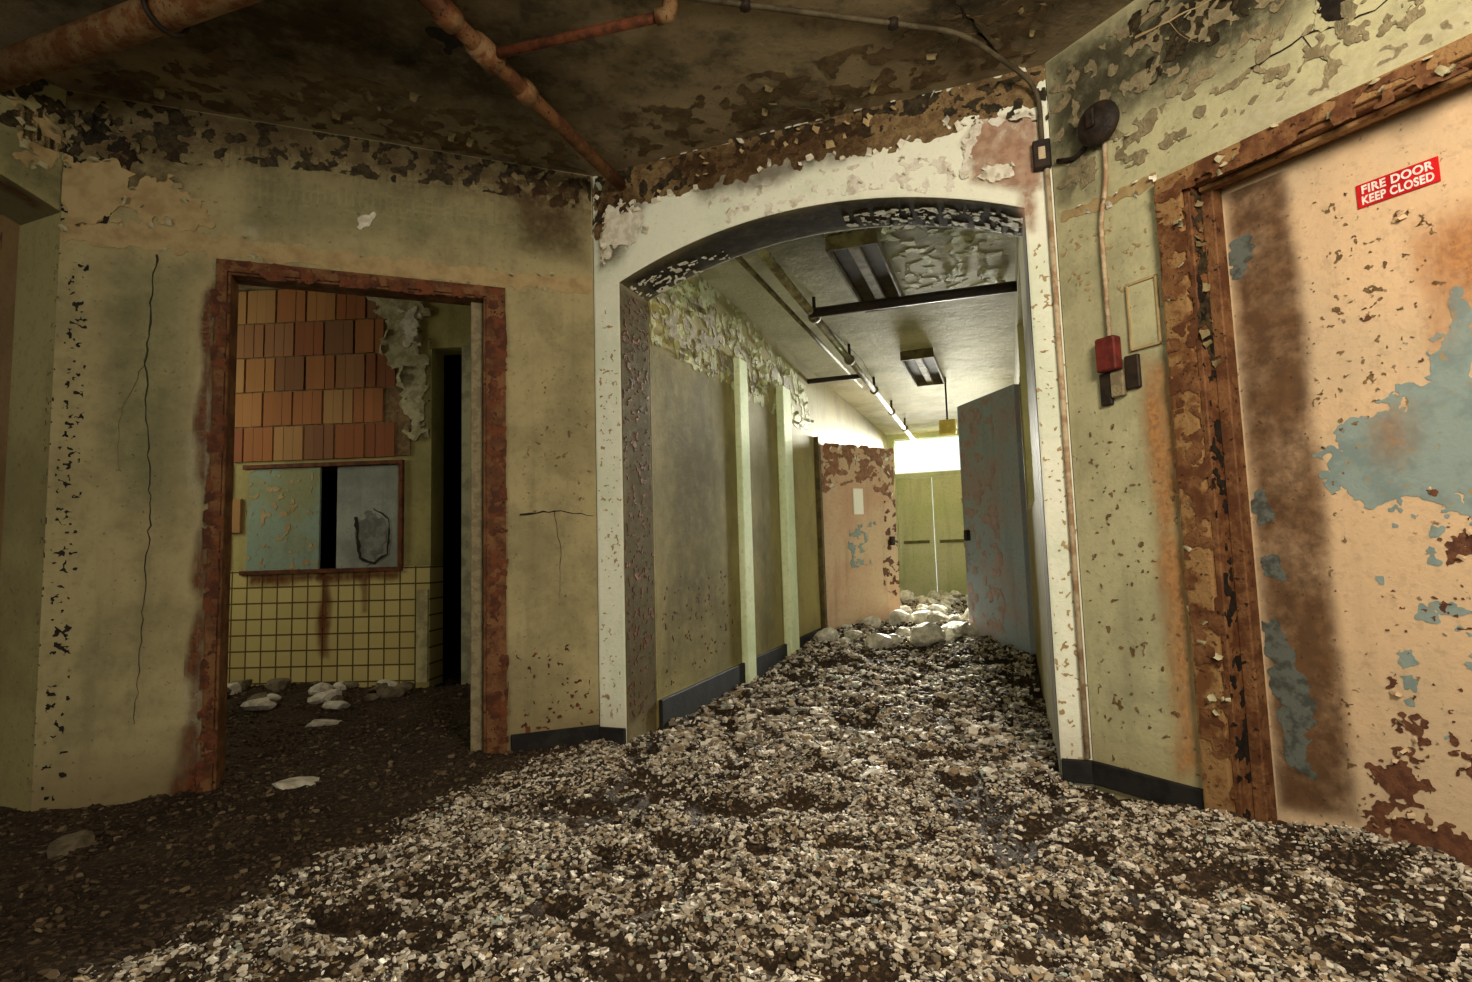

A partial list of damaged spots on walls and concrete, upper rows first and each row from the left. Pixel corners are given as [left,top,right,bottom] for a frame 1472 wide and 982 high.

spalling [27,675,70,801]
rust [172,286,231,795]
rust [225,260,509,754]
peeling [6,0,1472,781]
rust [1147,55,1472,820]